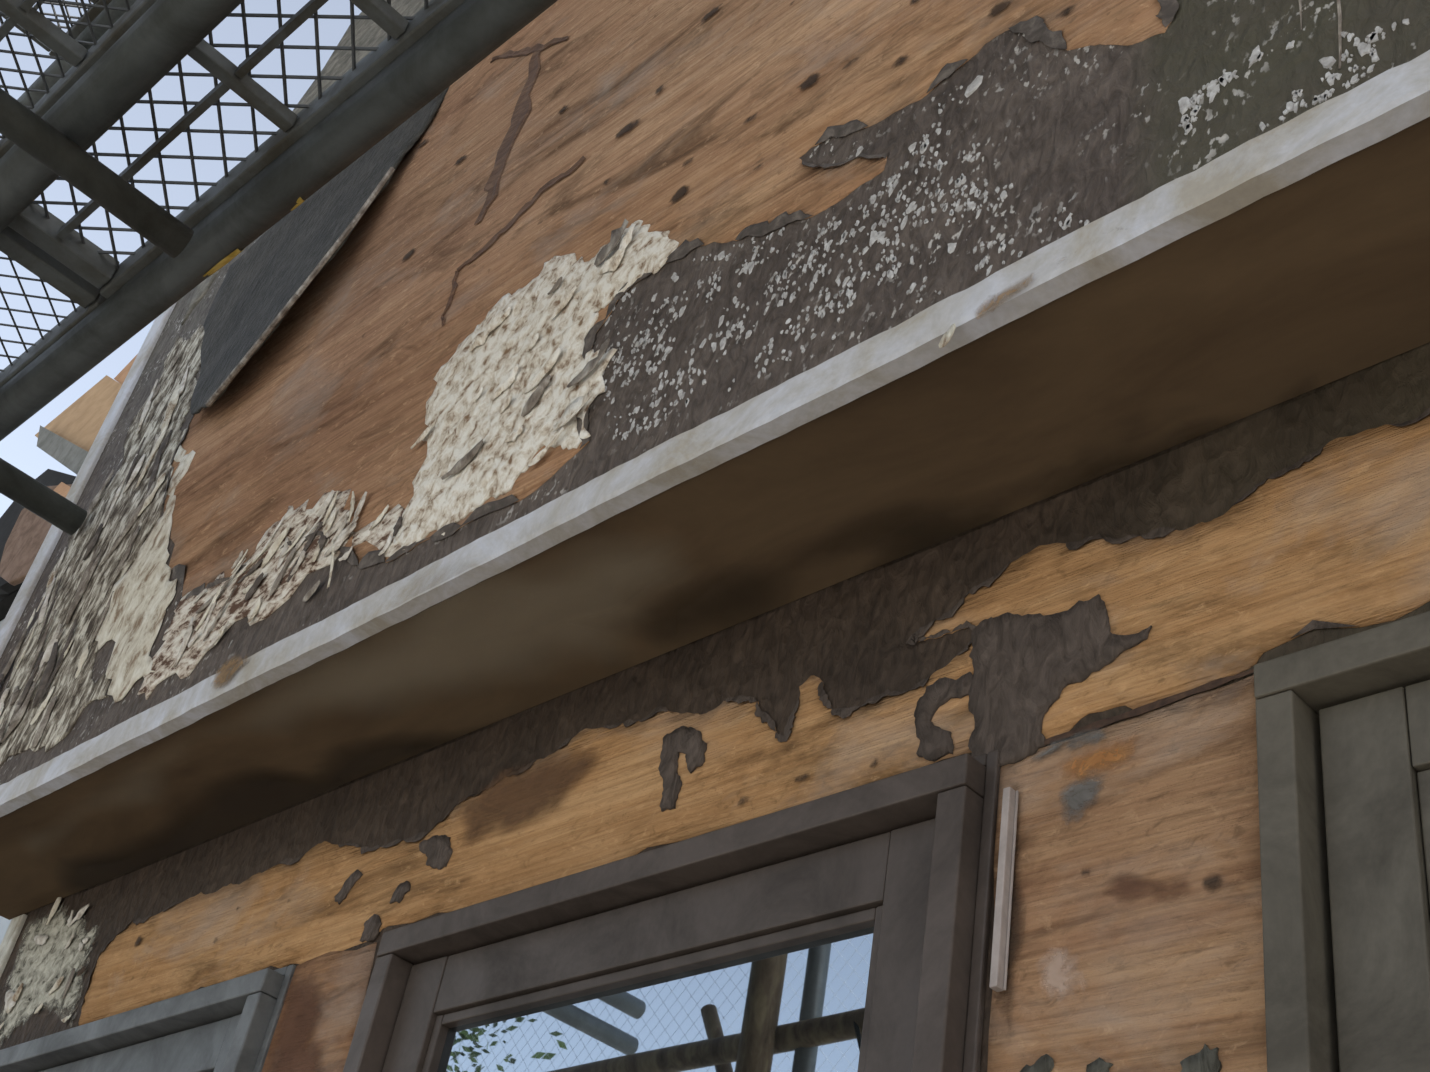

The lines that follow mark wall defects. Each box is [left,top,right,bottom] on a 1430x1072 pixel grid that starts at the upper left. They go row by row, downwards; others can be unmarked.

crack [441,36,586,326]
peeling [0,0,1179,766]
water stain [465,756,591,837]
peeling [0,407,1430,1072]